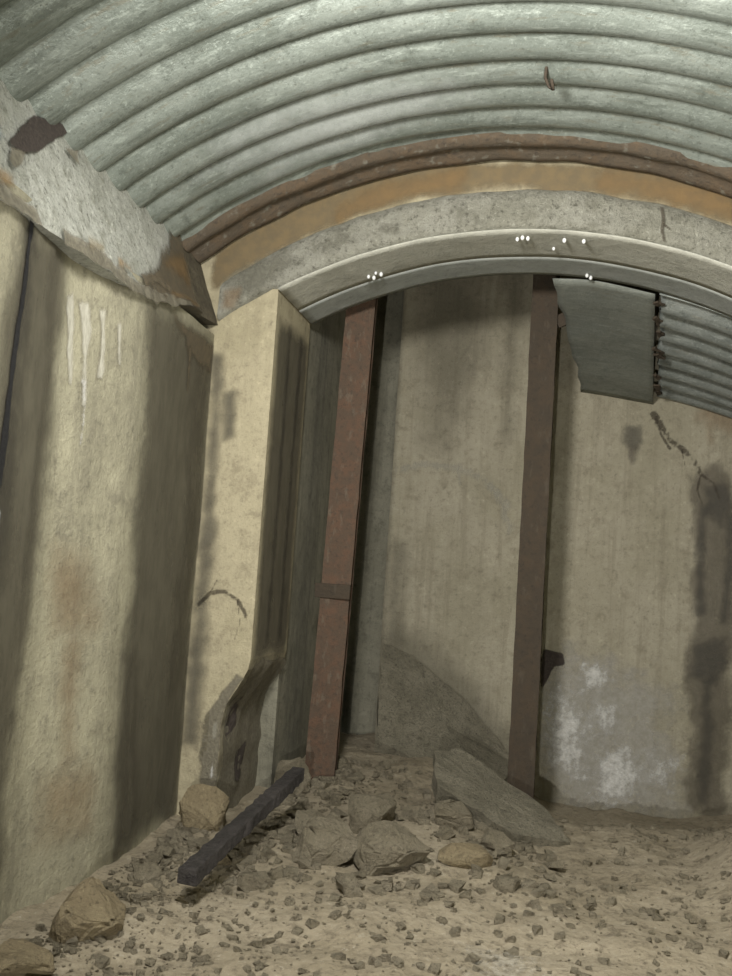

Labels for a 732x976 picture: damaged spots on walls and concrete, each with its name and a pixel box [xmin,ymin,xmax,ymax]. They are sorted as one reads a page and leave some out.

spalling [0,115,67,225]
corrosion [213,163,732,287]
crack [650,412,719,497]
damp [582,663,607,692]
damp [685,465,732,815]
damp [543,686,615,780]
damp [598,746,677,806]